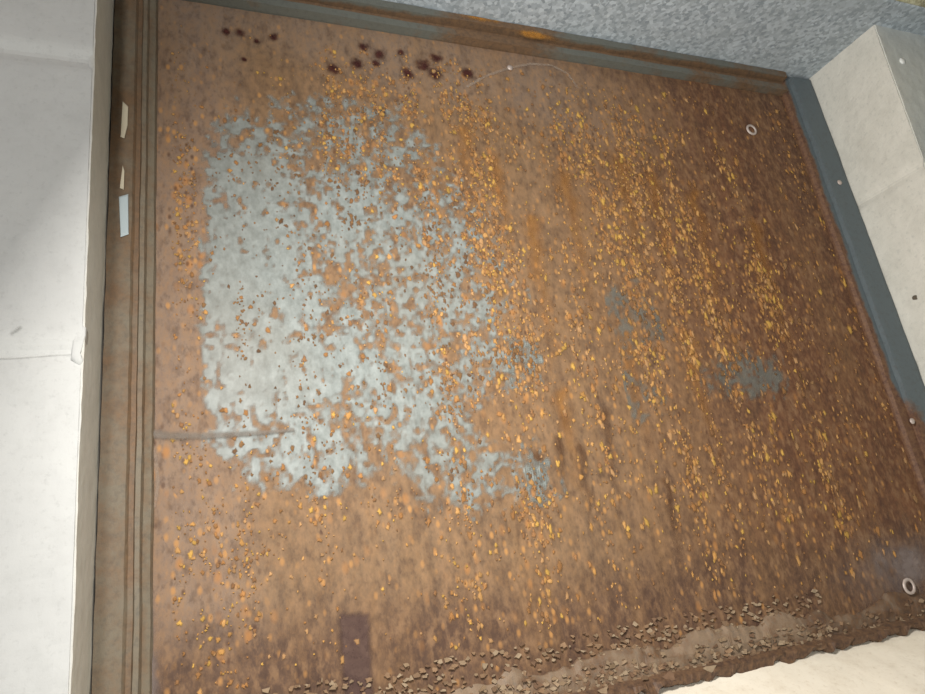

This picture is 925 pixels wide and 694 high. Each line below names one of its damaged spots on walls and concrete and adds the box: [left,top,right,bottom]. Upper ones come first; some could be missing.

rust [223,28,277,43]
rust [171,113,225,326]
rust [170,356,286,694]
peeling [198,97,555,513]
rust [206,44,925,694]
peeling [708,357,785,399]